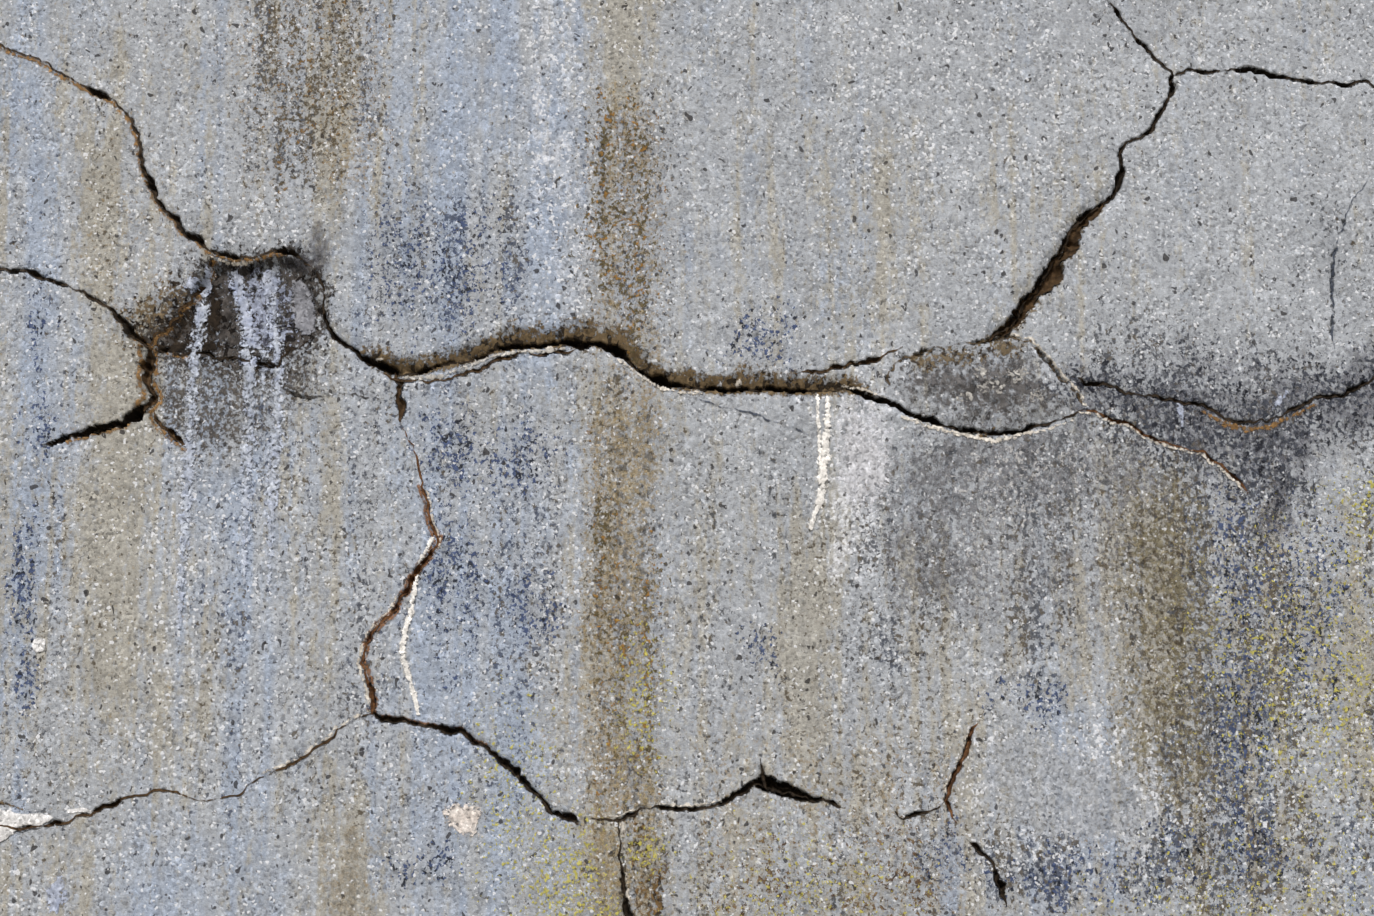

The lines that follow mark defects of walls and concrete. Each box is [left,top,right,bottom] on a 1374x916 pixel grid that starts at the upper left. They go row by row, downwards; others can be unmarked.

crack [978,0,1374,348]
crack [0,43,1248,831]
crack [1072,376,1374,433]
water stain [808,332,1374,835]
crack [591,758,841,916]
crack [891,720,1007,907]
water stain [914,814,1016,908]